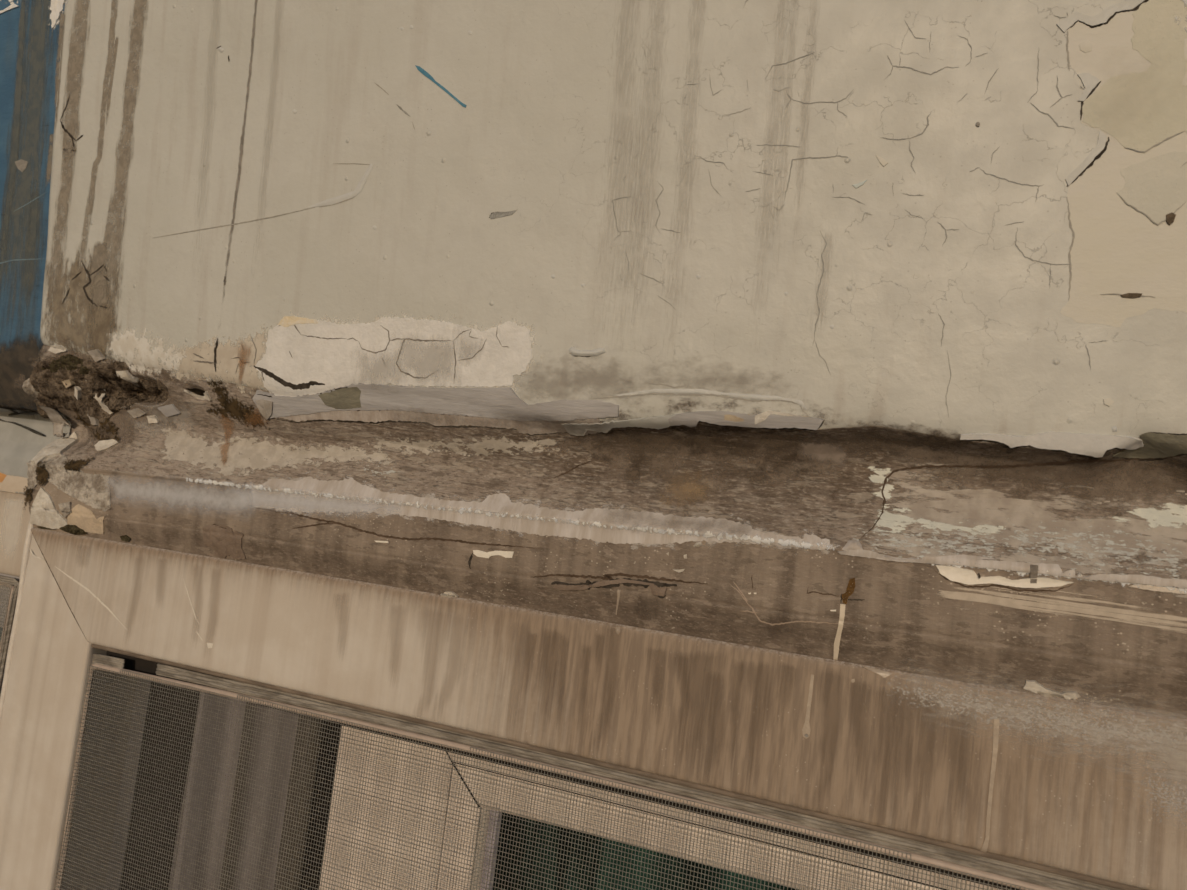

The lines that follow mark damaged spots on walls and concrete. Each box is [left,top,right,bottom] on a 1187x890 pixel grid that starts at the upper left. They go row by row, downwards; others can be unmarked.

peeling [15,159,28,172]
damp [0,0,147,360]
crack [686,52,853,210]
crack [882,21,999,246]
crack [970,147,1070,286]
crack [1027,51,1084,128]
peeling [1056,0,1187,327]
crack [813,231,831,375]
crack [938,314,951,417]
peeling [0,314,1187,598]
damp [557,415,1187,516]